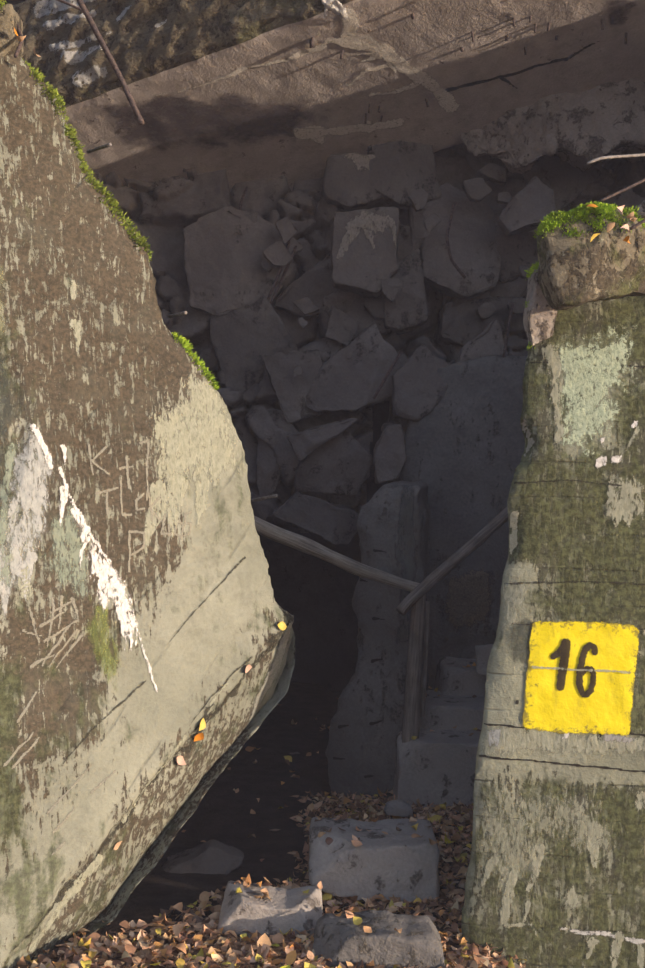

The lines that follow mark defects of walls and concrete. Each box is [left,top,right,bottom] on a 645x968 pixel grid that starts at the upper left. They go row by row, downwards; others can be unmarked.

crack [156,8,599,114]
crack [293,118,405,144]